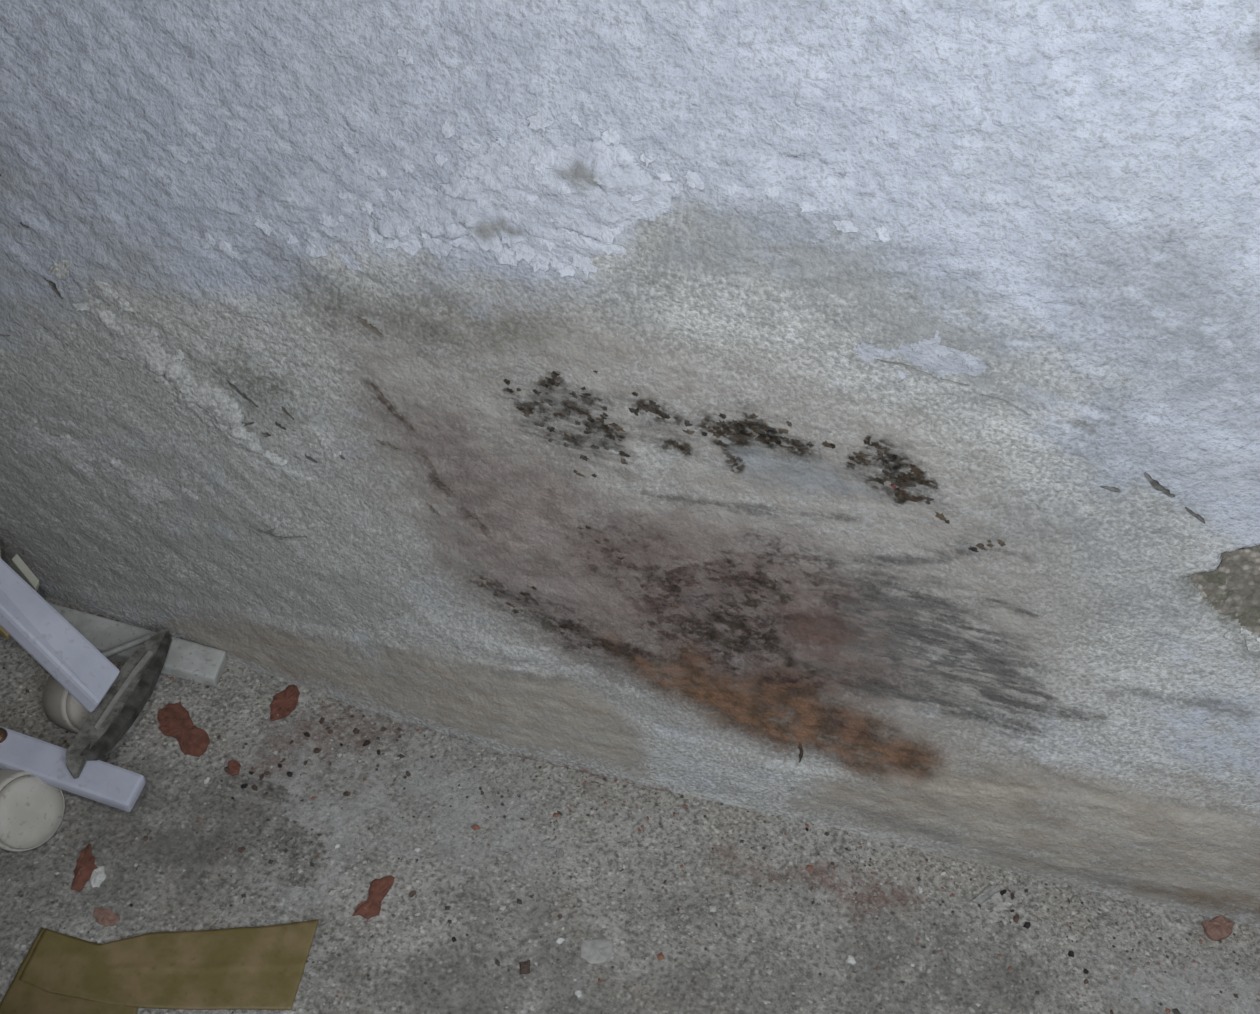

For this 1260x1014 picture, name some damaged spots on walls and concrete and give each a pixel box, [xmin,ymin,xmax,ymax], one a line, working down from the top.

water stain [348,317,1053,740]
spalling [1189,545,1260,655]
rust [611,642,1045,813]